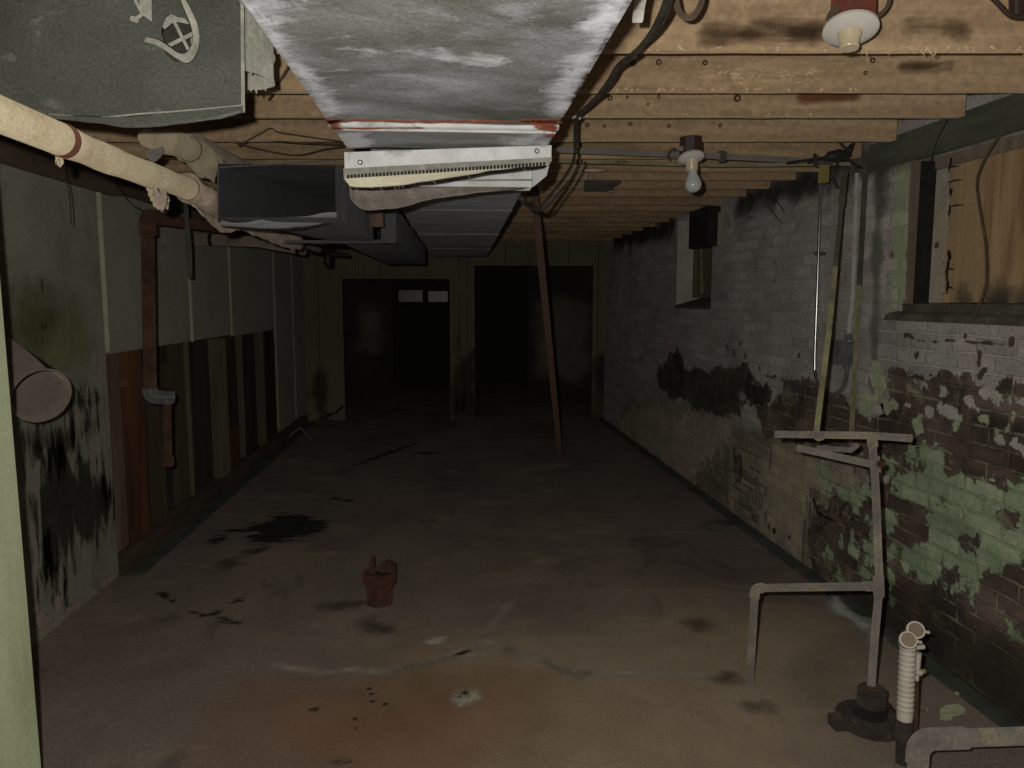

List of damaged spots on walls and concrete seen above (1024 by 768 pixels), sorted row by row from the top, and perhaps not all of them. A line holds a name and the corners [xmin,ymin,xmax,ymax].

corrosion [325,118,562,139]
damp [21,387,115,606]
damp [204,512,332,567]
flaking render [657,342,1024,696]
crack [272,604,702,676]